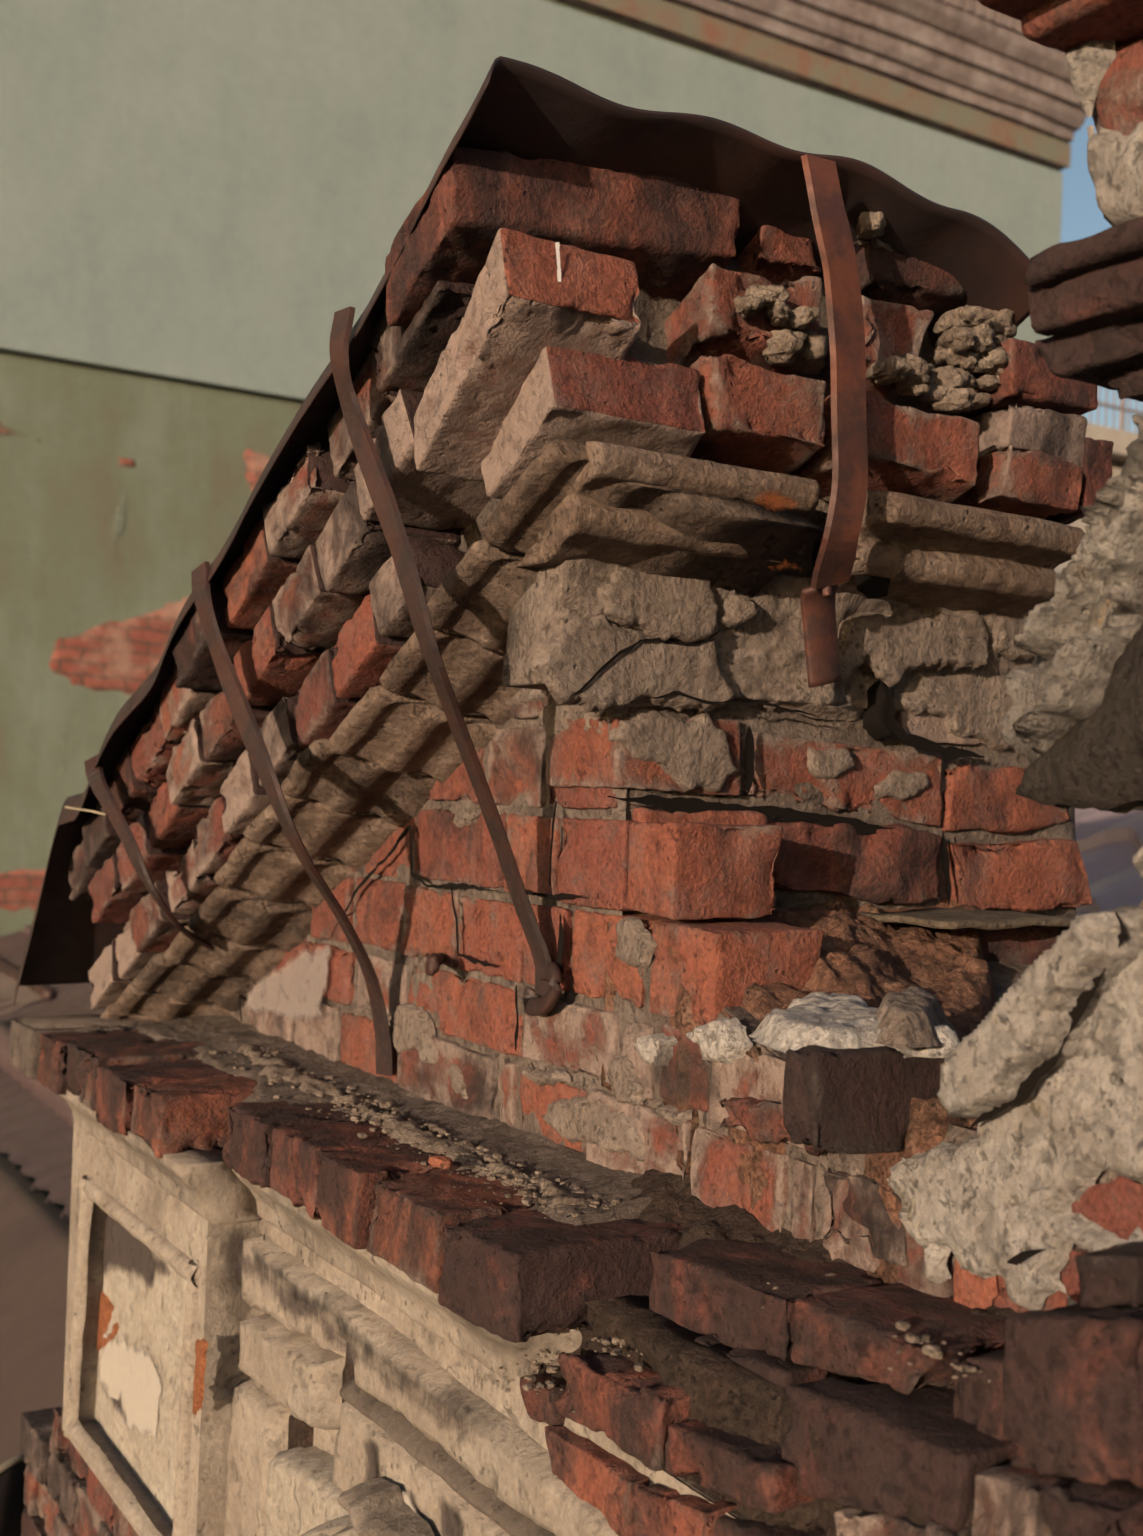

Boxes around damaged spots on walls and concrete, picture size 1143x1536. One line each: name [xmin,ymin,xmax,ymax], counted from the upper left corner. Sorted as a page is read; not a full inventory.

flaking render [1064,40,1143,227]
crack [569,625,725,698]
crack [608,691,895,835]
peeling [807,747,855,779]
spalling [862,681,897,742]
crack [331,802,585,1050]
crack [940,830,952,905]
flaking render [1131,847,1143,881]
crack [971,912,1127,1127]
spalling [520,916,1143,1536]
peeling [97,1291,162,1439]
spalling [192,1338,209,1415]